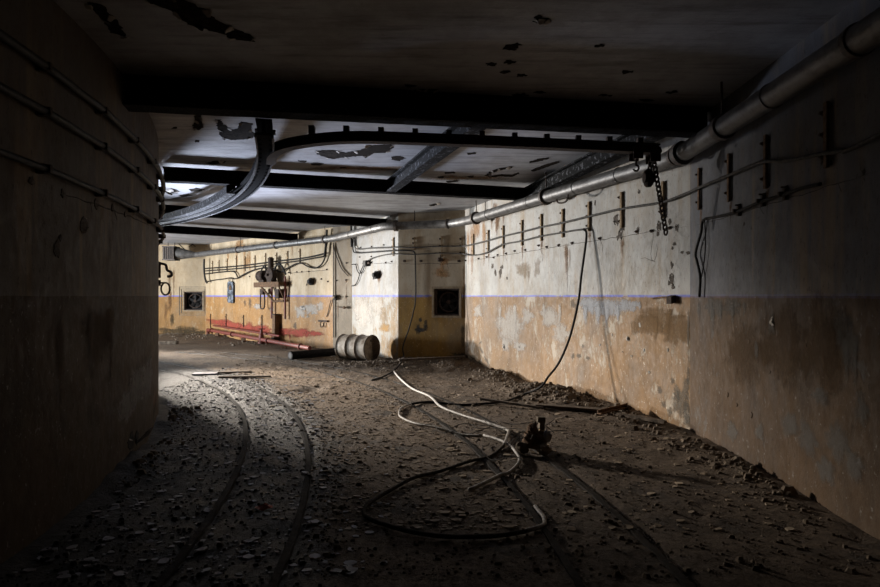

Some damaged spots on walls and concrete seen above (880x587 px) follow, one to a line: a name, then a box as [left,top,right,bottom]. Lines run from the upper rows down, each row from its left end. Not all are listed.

peeling [143,0,256,42]
peeling [214,119,254,140]
peeling [298,145,406,168]
peeling [296,302,323,318]